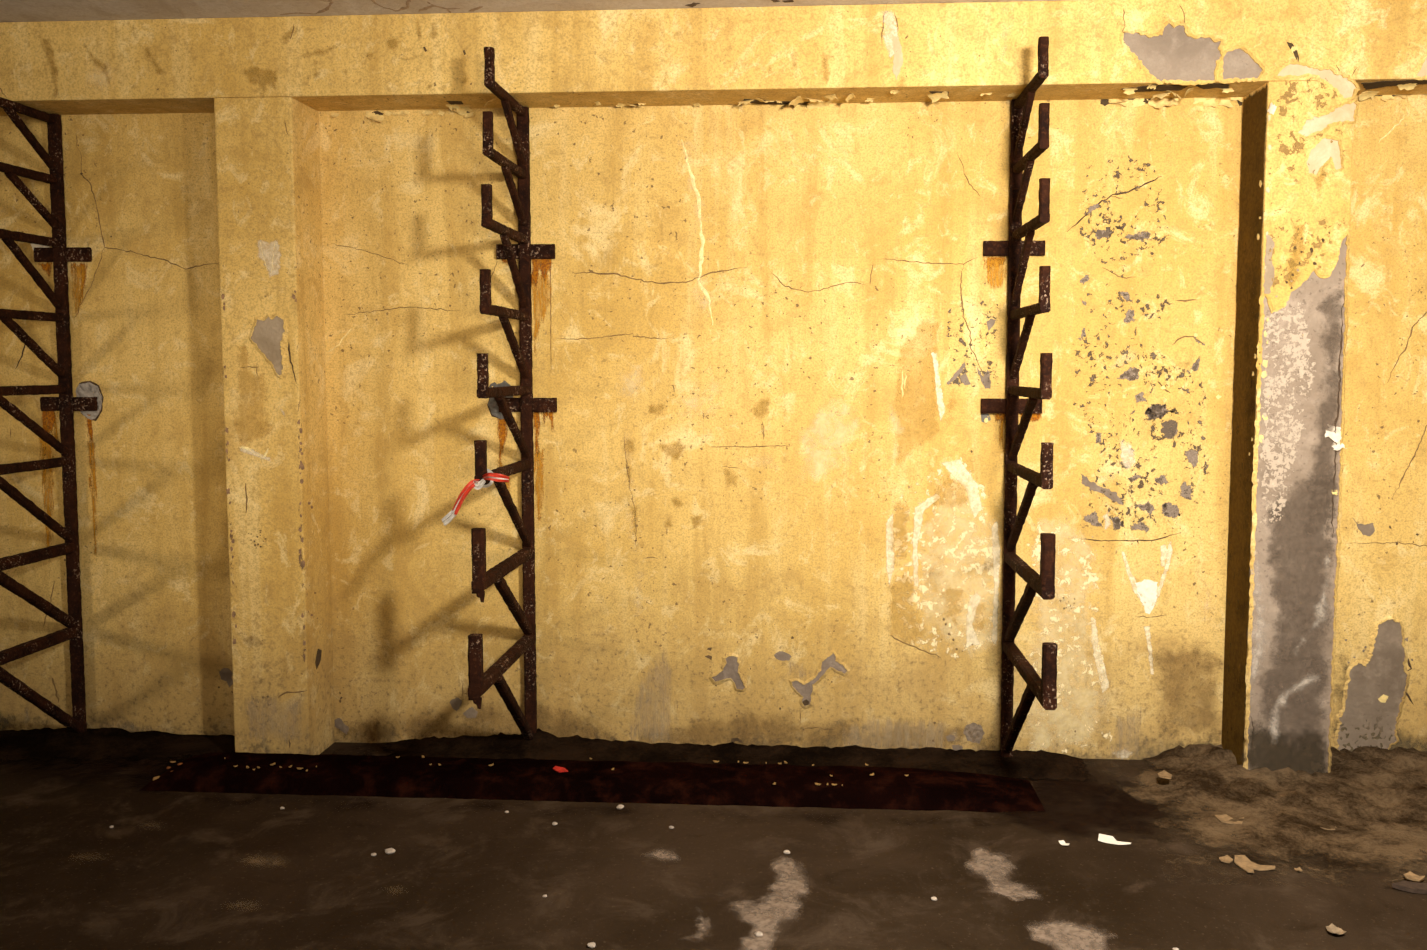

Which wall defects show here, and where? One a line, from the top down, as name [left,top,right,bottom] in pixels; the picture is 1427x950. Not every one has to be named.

peeling [1100,6,1427,182]
peeling [248,312,298,379]
corrosion [531,259,552,351]
crack [557,141,983,374]
peeling [1073,155,1222,532]
crack [1387,312,1427,383]
corrosion [39,411,58,547]
corrosion [87,414,97,554]
peeling [1243,209,1427,774]
crack [1393,425,1427,496]
peeling [705,647,751,692]
water stain [1341,727,1427,752]